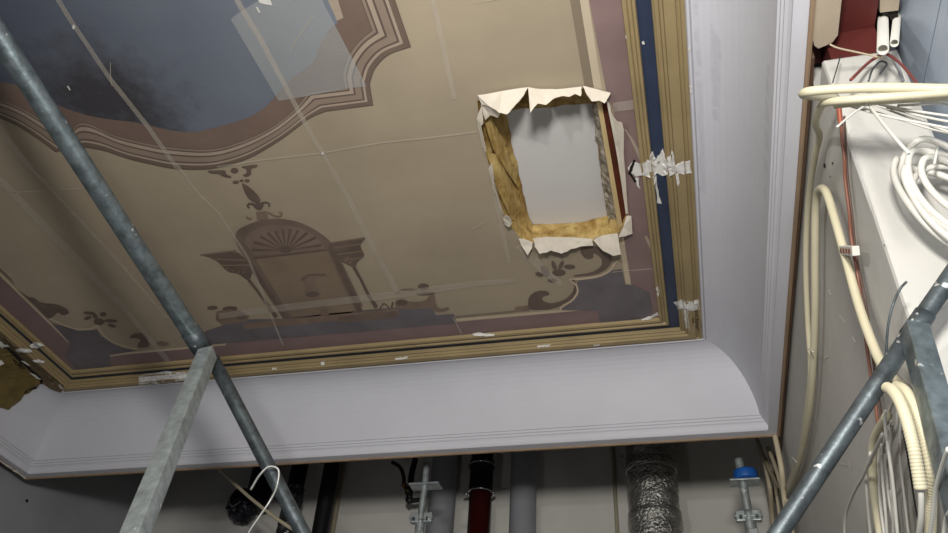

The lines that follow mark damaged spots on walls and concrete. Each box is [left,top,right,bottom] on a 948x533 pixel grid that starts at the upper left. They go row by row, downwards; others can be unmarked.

peeling [0,334,64,410]